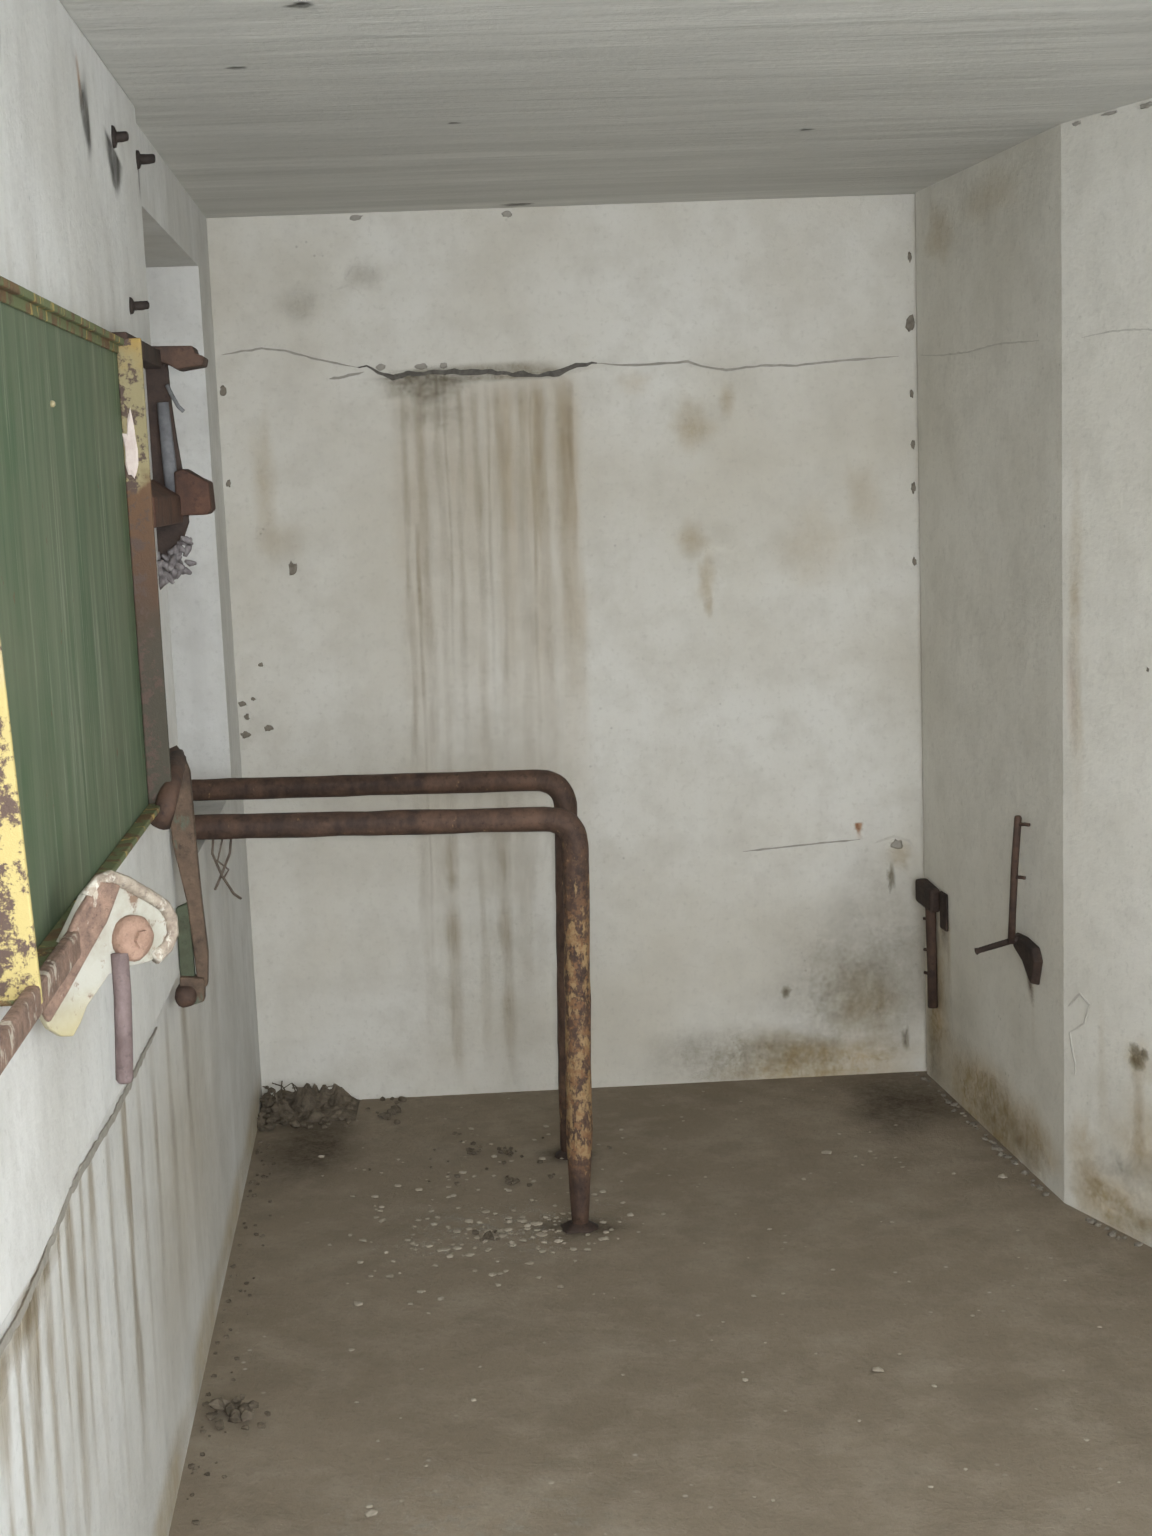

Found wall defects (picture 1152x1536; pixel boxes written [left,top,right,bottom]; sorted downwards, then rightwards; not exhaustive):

crack [1082,328,1152,338]
crack [223,340,1039,381]